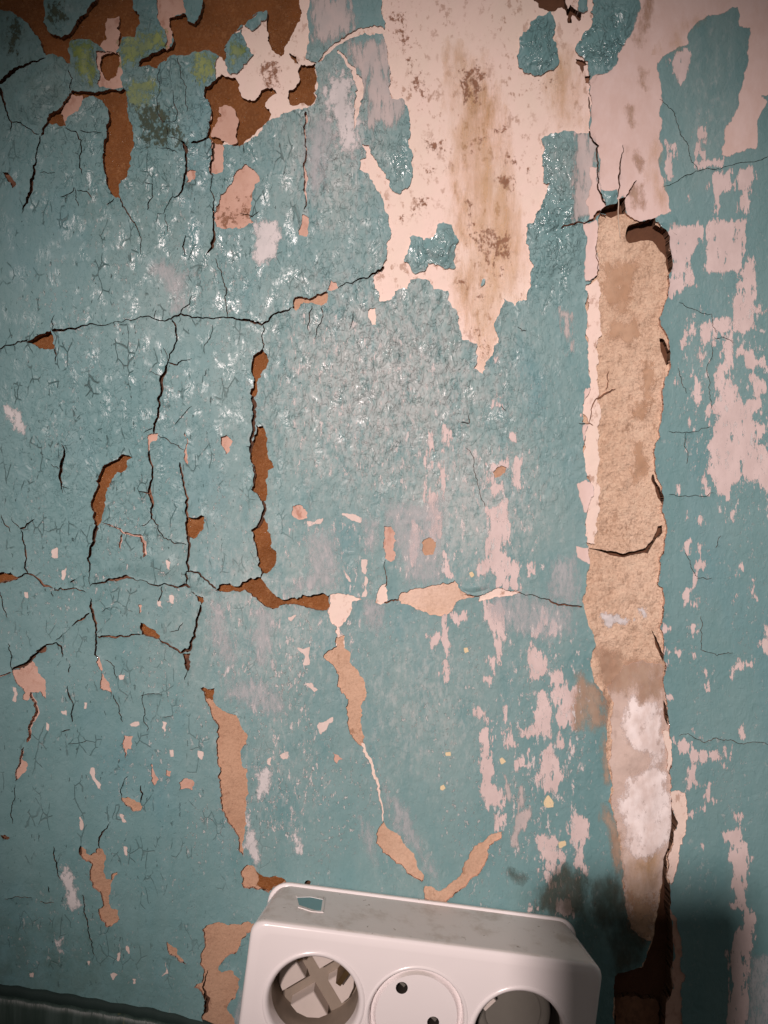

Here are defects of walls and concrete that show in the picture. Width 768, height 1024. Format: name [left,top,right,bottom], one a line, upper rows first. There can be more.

flaking render [0,0,140,199]
flaking render [138,0,318,229]
crack [318,25,385,128]
crack [660,99,767,187]
crack [338,266,384,288]
crack [0,57,324,744]
peeling [193,0,768,912]
crack [384,561,399,604]
crack [464,590,582,608]
flaking render [194,921,254,1024]
spalling [614,725,746,1024]
peeling [722,812,757,1024]